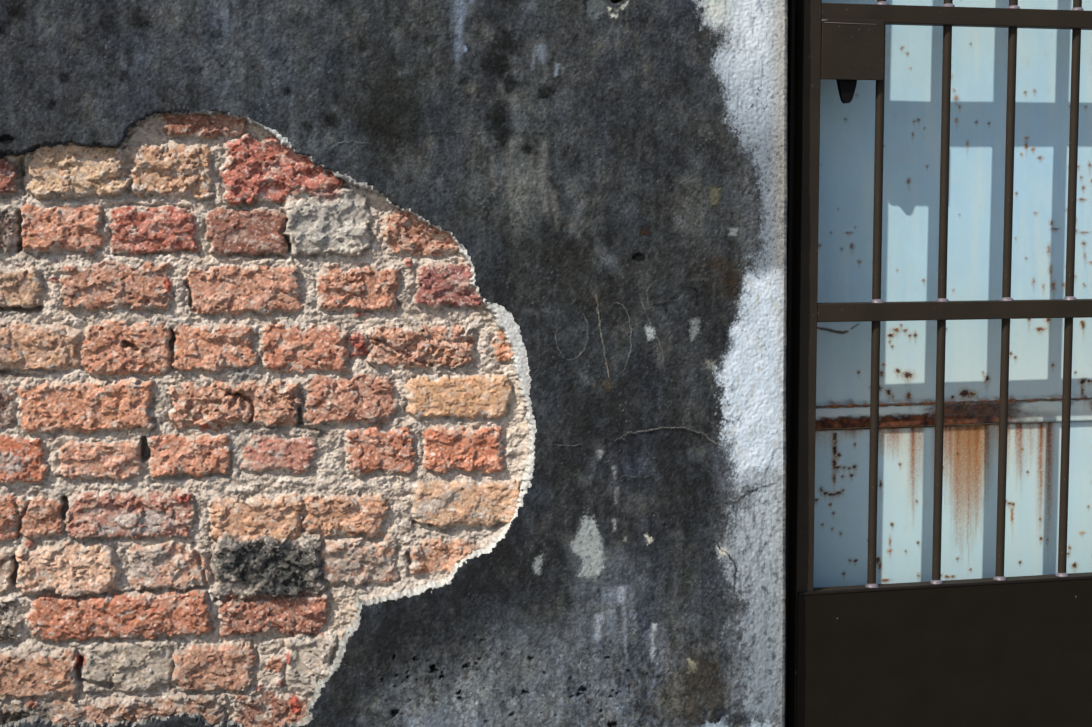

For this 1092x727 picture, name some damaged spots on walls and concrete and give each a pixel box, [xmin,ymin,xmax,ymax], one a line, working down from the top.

water stain [456,0,473,56]
water stain [484,30,559,217]
flaking render [0,110,537,727]
crack [614,420,720,449]
corrosion [815,364,1092,515]
water stain [713,706,748,727]